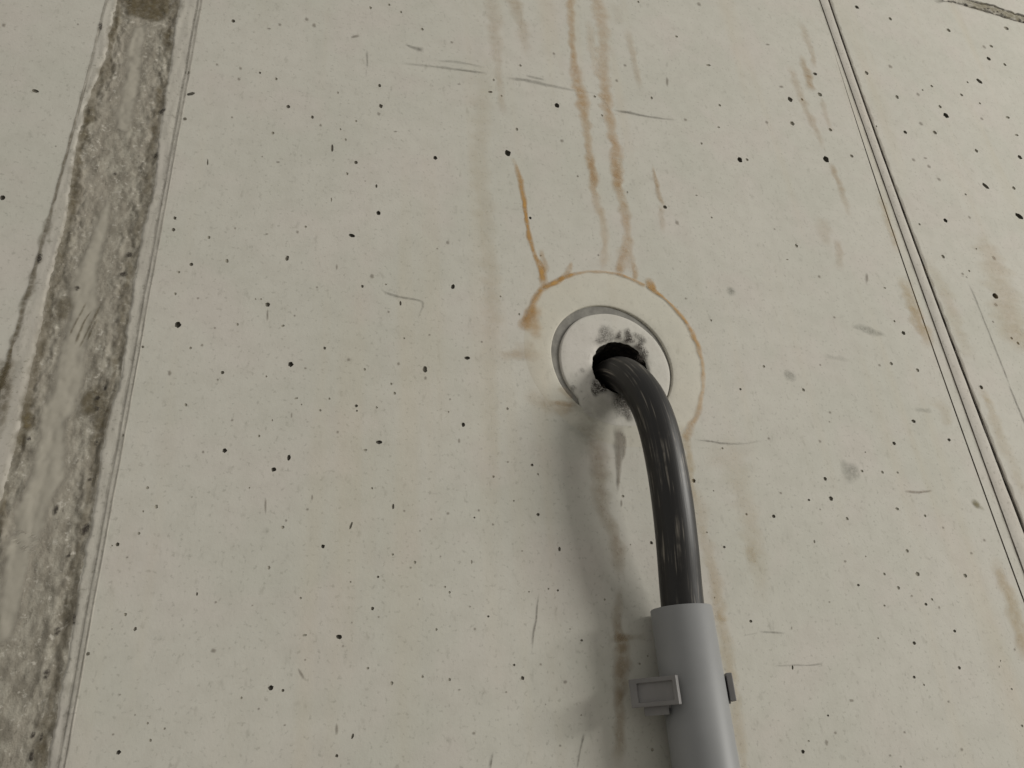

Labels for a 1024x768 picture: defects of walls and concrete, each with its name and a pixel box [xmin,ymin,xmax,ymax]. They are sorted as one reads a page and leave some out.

corrosion [519,176,574,320]
leakage [617,330,648,356]
corrosion [648,282,701,357]